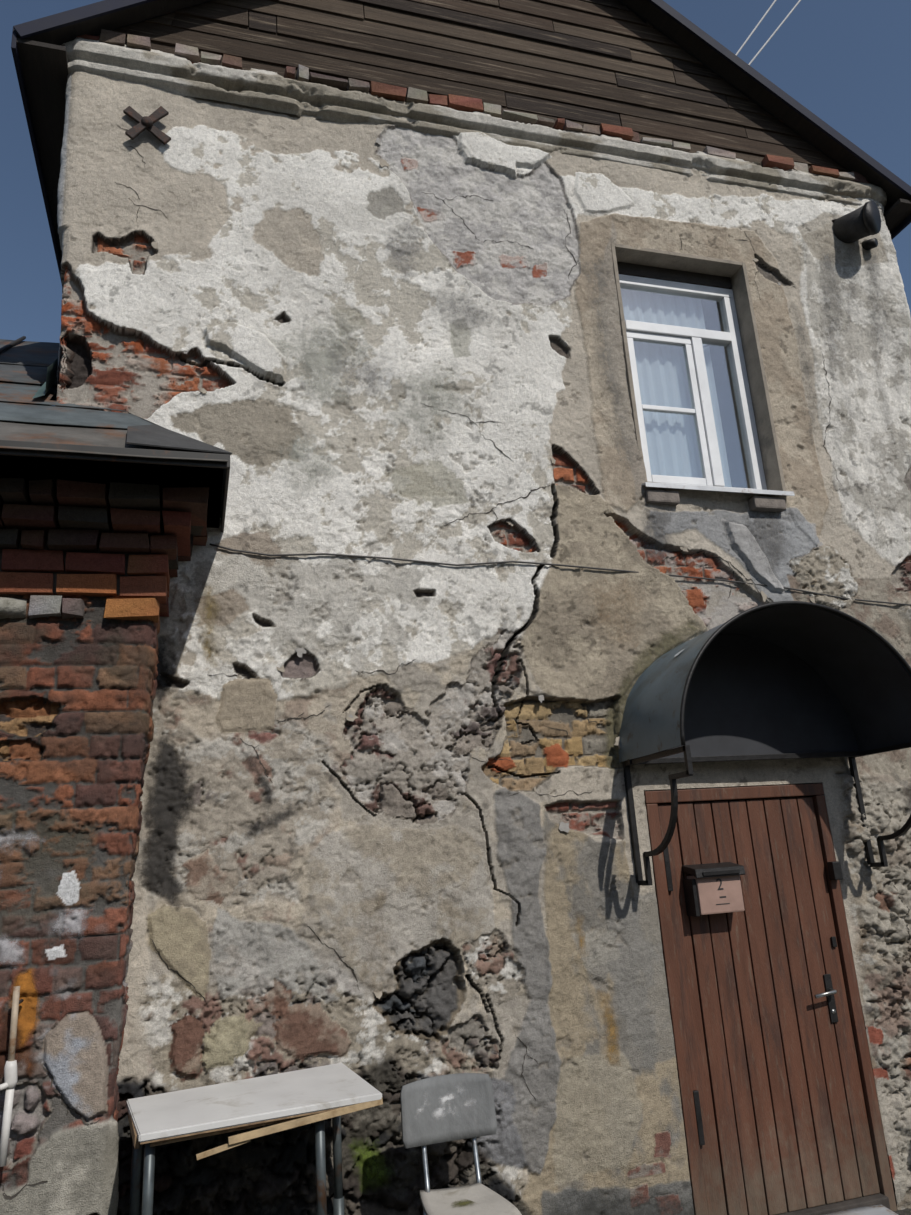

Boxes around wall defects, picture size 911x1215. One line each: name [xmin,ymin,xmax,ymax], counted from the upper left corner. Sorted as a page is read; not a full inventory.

crack [422,192,533,249]
crack [563,209,577,278]
spalling [56,261,237,419]
crack [421,403,514,462]
spalling [487,518,541,553]
spalling [604,512,858,630]
water stain [156,647,173,700]
spalling [340,627,621,825]
crack [443,483,601,797]
water stain [139,740,193,906]
crack [464,792,521,926]
spalling [373,928,526,1071]